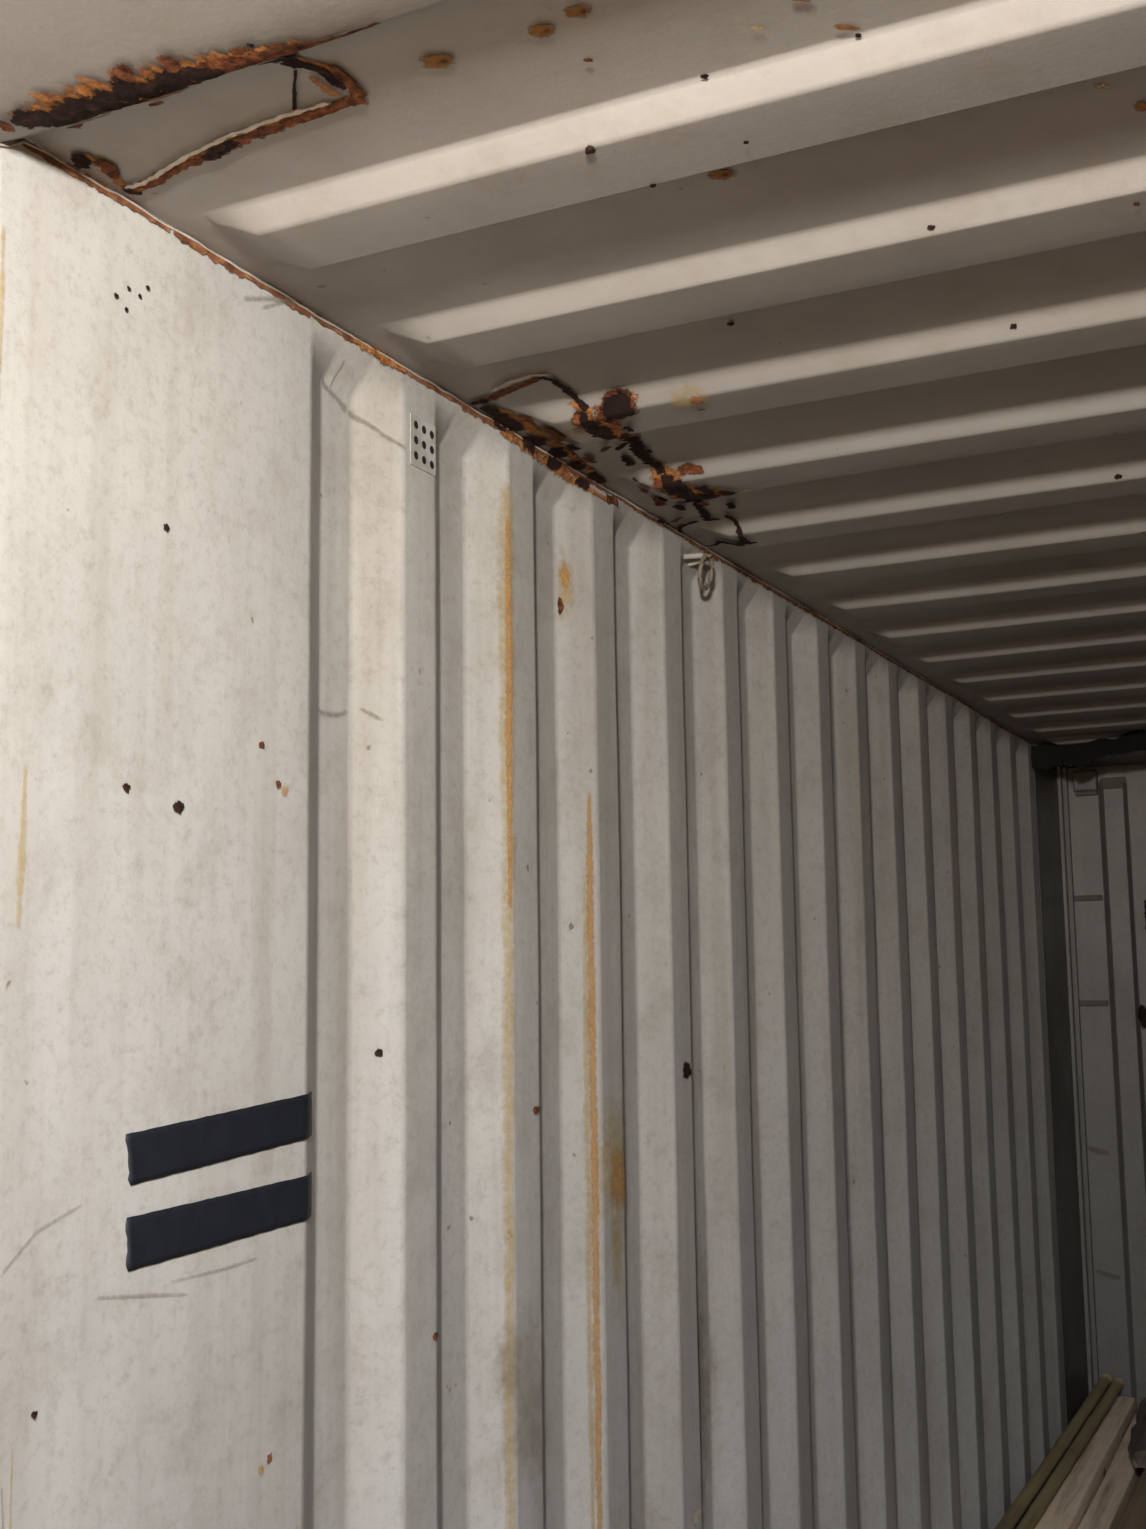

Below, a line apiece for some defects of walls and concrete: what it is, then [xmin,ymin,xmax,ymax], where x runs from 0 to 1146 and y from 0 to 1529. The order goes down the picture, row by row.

corrosion [505,521,513,904]
corrosion [0,22,1032,744]
corrosion [528,6,591,38]
corrosion [586,798,625,1529]